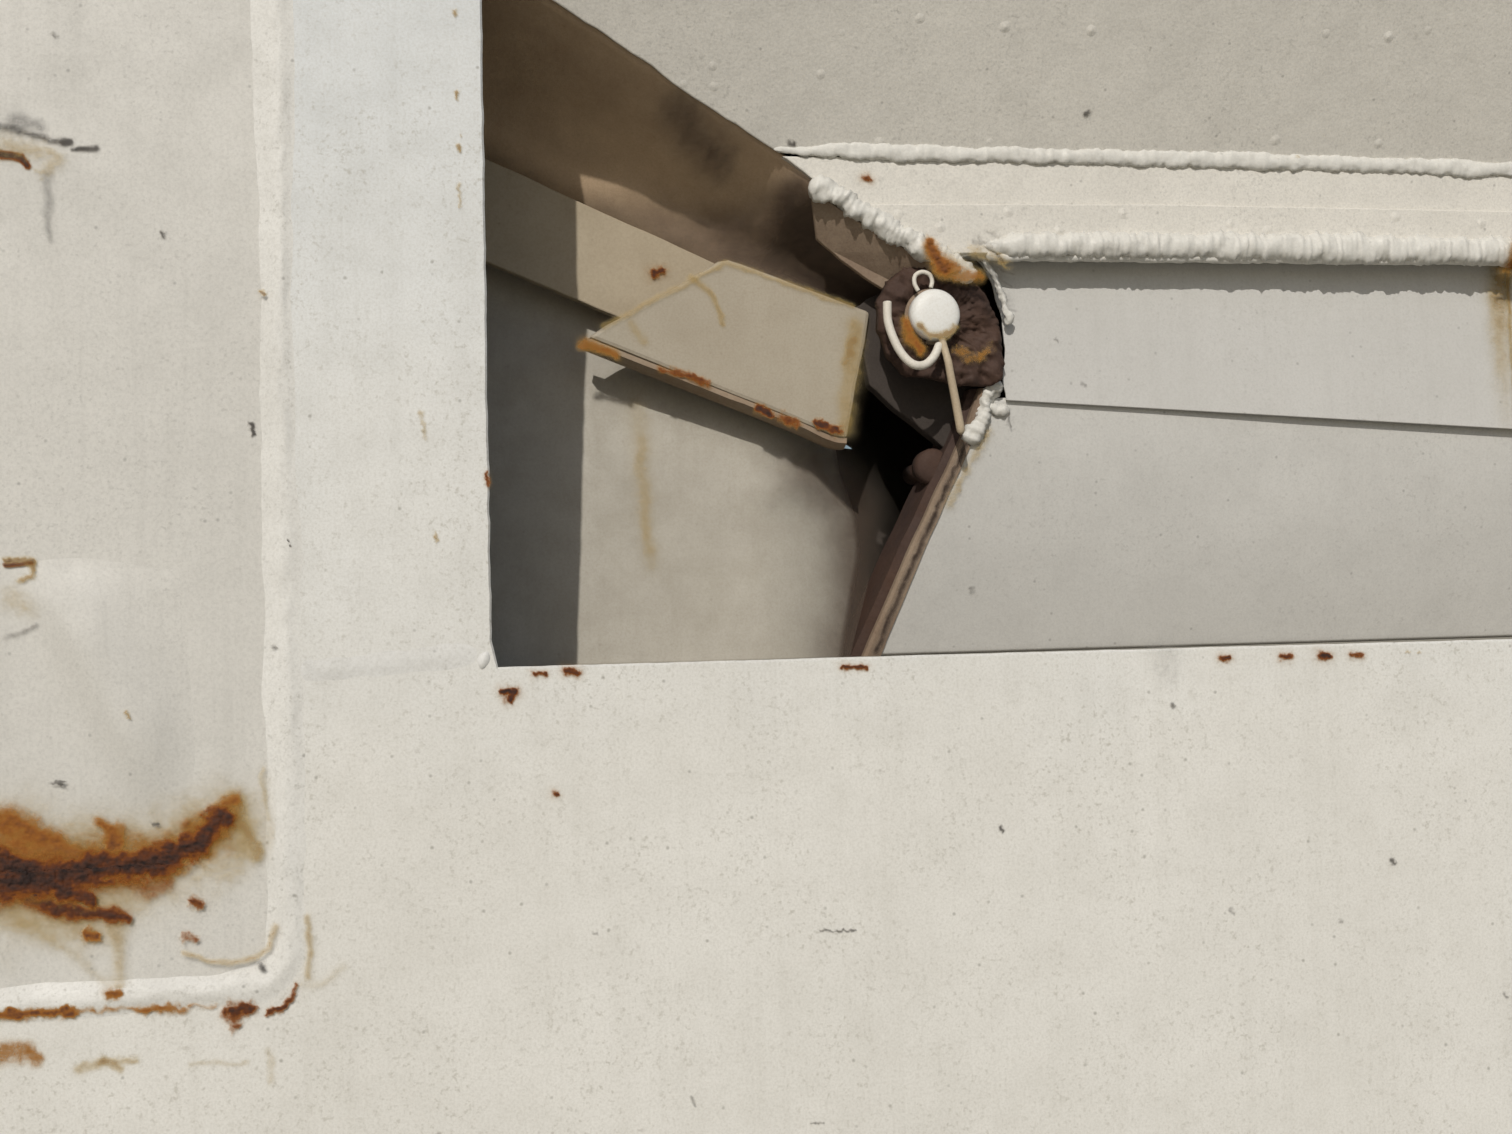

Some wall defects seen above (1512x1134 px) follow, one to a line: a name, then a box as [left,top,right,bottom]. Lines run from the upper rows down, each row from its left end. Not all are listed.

corrosion [923,237,984,281]
corrosion [1491,248,1512,349]
corrosion [577,339,619,359]
corrosion [902,317,957,356]
corrosion [658,367,711,387]
corrosion [754,404,848,434]
corrosion [0,793,262,942]
corrosion [181,931,275,971]
corrosion [0,989,193,1021]
corrosion [221,983,298,1030]
corrosion [0,1043,43,1064]
corrosion [97,1058,119,1068]